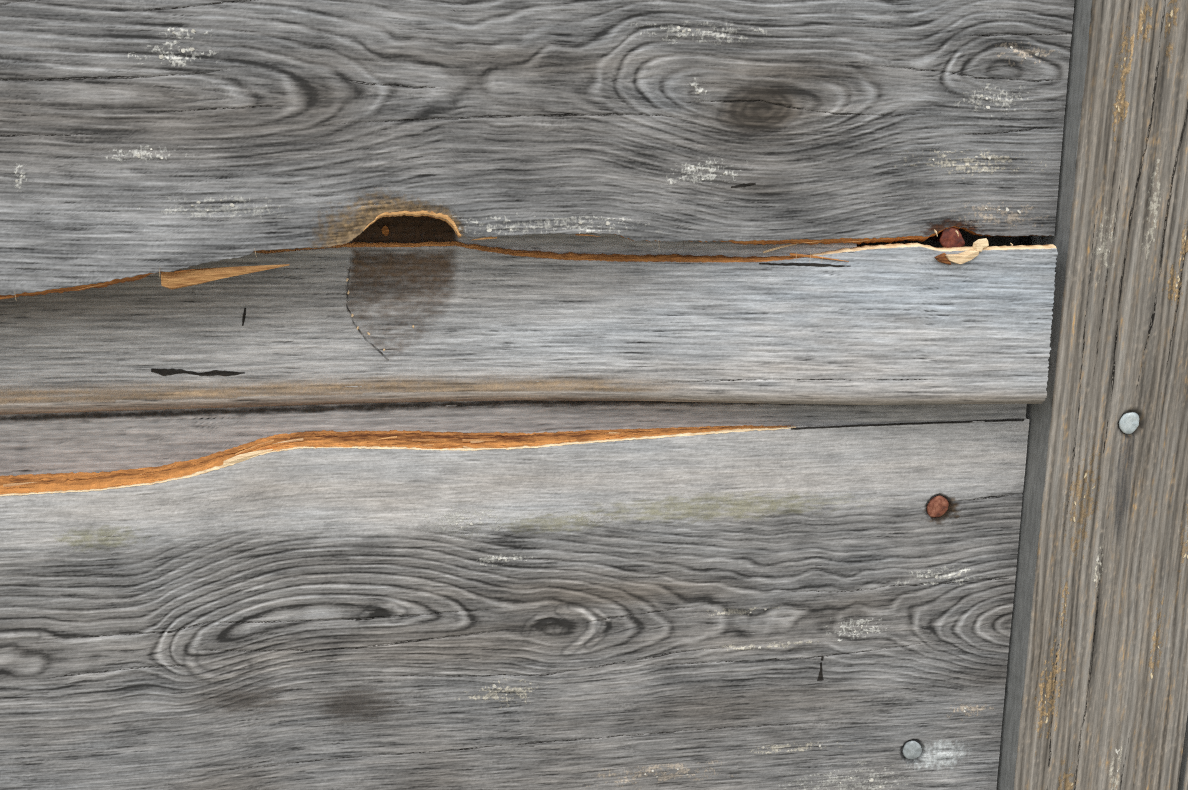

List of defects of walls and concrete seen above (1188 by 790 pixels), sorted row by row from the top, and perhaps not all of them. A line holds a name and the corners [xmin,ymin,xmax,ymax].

damp [346,250,452,335]
crack [0,226,1057,299]
crack [0,379,1027,496]
rust [926,496,959,521]